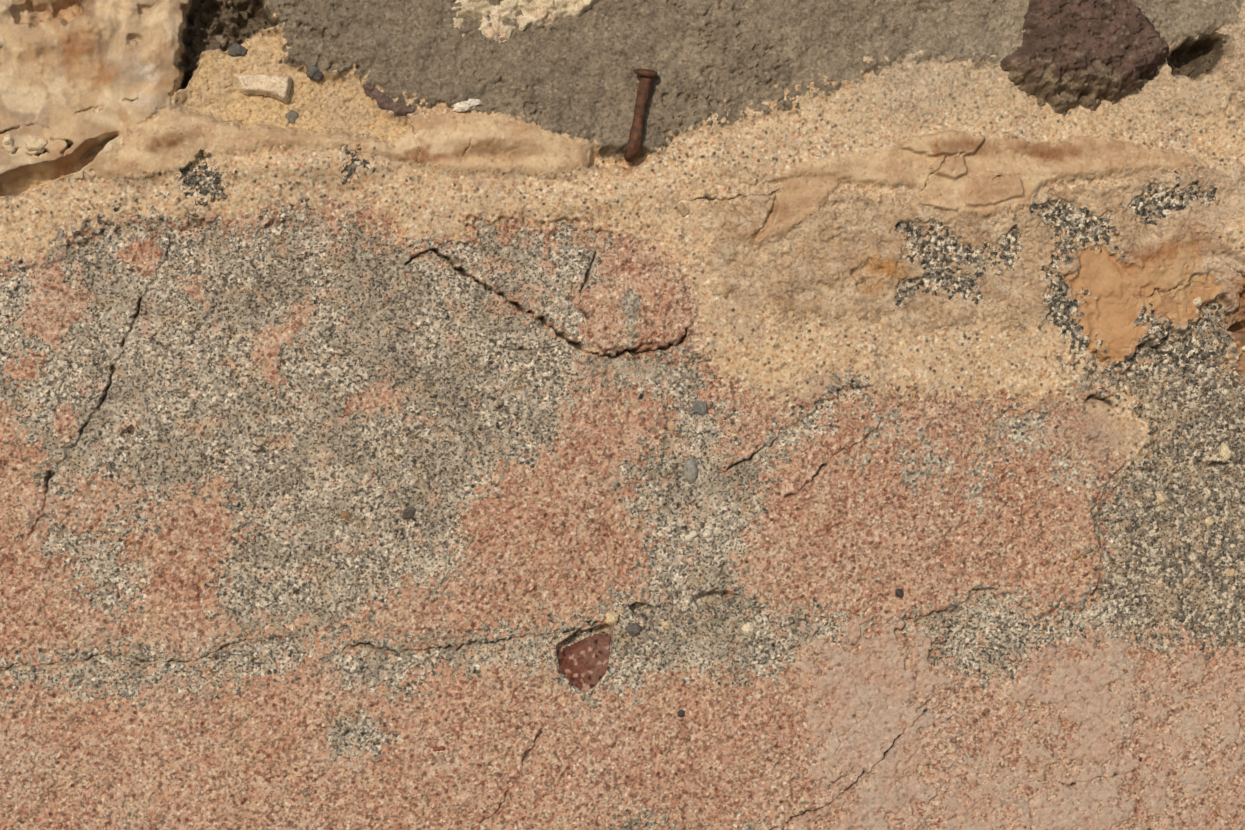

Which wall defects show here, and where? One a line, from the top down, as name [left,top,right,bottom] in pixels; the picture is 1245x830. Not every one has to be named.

spalling [168,0,283,98]
spalling [360,79,416,117]
spalling [1167,32,1236,83]
spalling [175,149,229,207]
crack [406,238,691,360]
crack [0,237,172,552]
spalling [0,193,591,703]
crack [707,433,785,473]
spalling [327,129,1245,830]
crack [775,400,913,508]
crack [0,638,257,672]
crack [330,603,616,661]